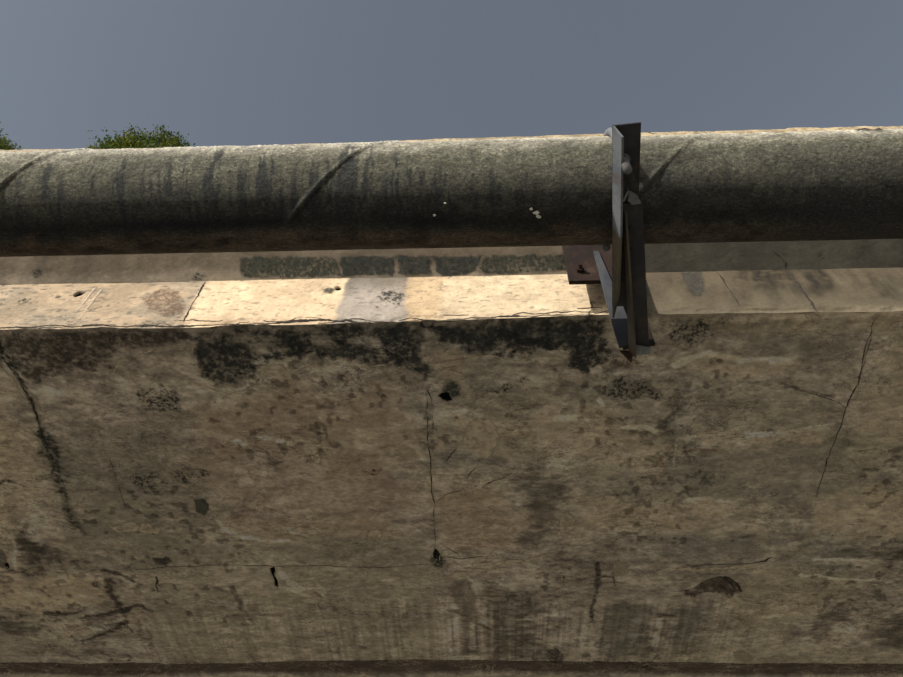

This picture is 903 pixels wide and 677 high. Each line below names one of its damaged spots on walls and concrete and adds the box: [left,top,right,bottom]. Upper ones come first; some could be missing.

crack [0,283,608,328]
crack [0,353,45,443]
damp [0,317,611,526]
crack [786,319,875,497]
crack [426,389,512,559]
crack [136,564,281,592]
spalling [678,563,761,598]